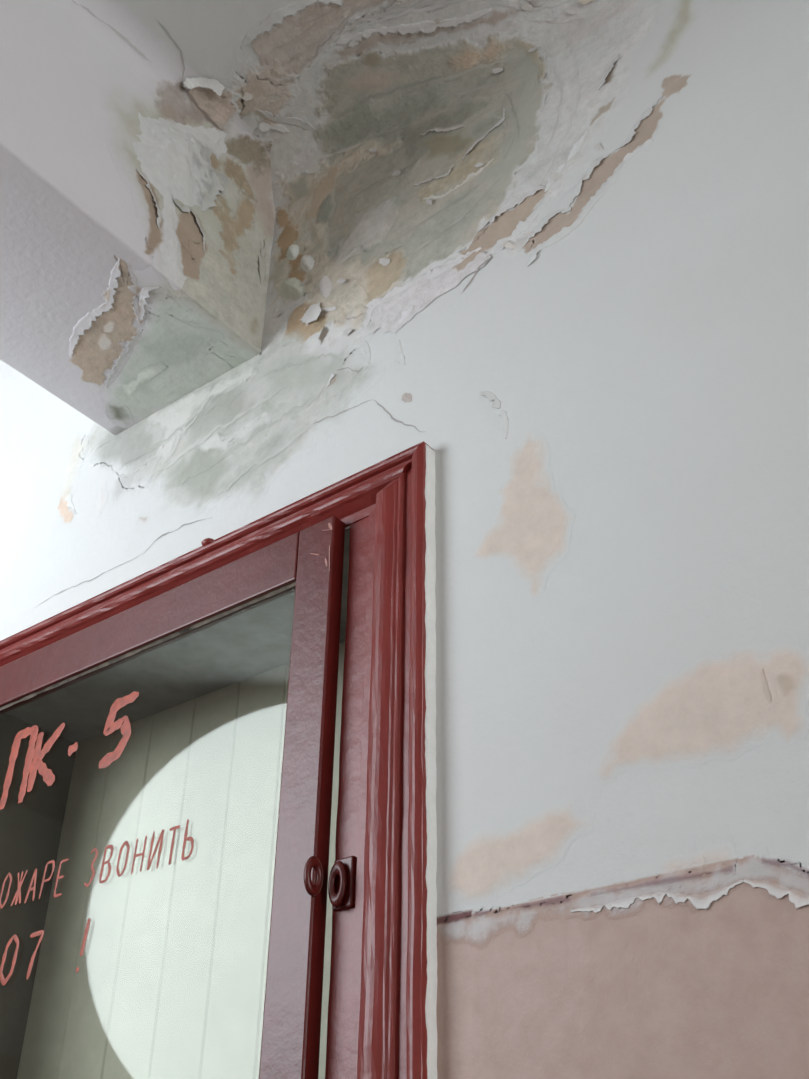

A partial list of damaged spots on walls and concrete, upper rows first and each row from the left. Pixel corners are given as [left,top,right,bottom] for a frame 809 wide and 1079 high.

crack [72,0,152,63]
crack [156,19,185,87]
peeling [174,0,693,365]
peeling [66,255,161,389]
water stain [79,293,384,525]
peeling [471,391,575,602]
peeling [594,642,809,785]
peeling [437,796,809,951]